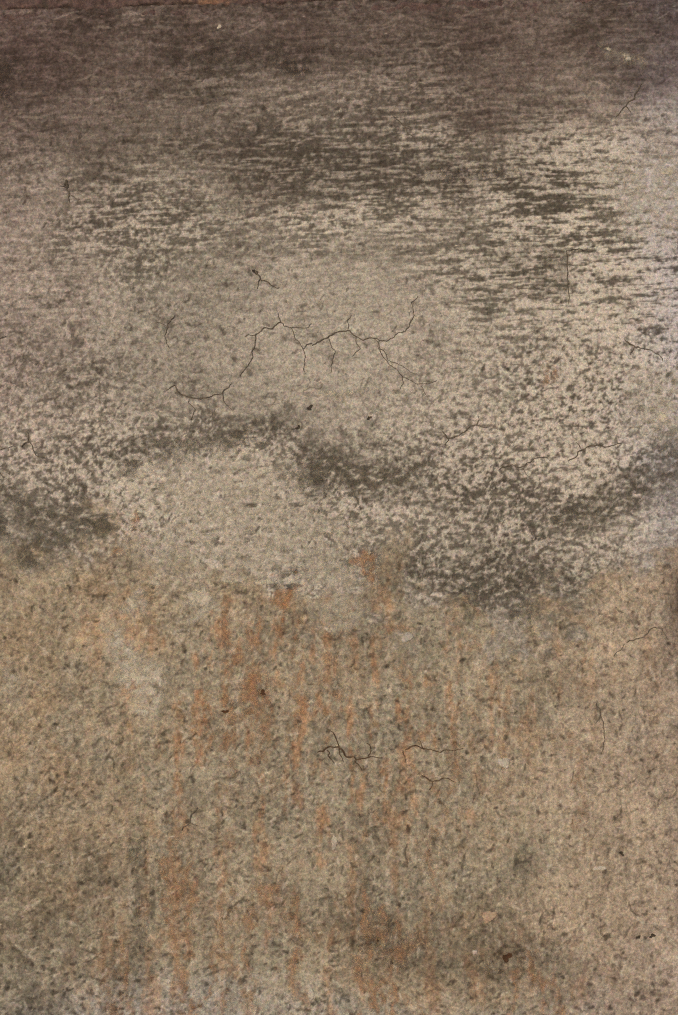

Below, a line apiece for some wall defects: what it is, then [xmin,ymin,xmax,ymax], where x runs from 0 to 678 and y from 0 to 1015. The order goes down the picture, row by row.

crack [167,296,437,419]
leakage [307,450,430,497]
leakage [17,501,109,565]